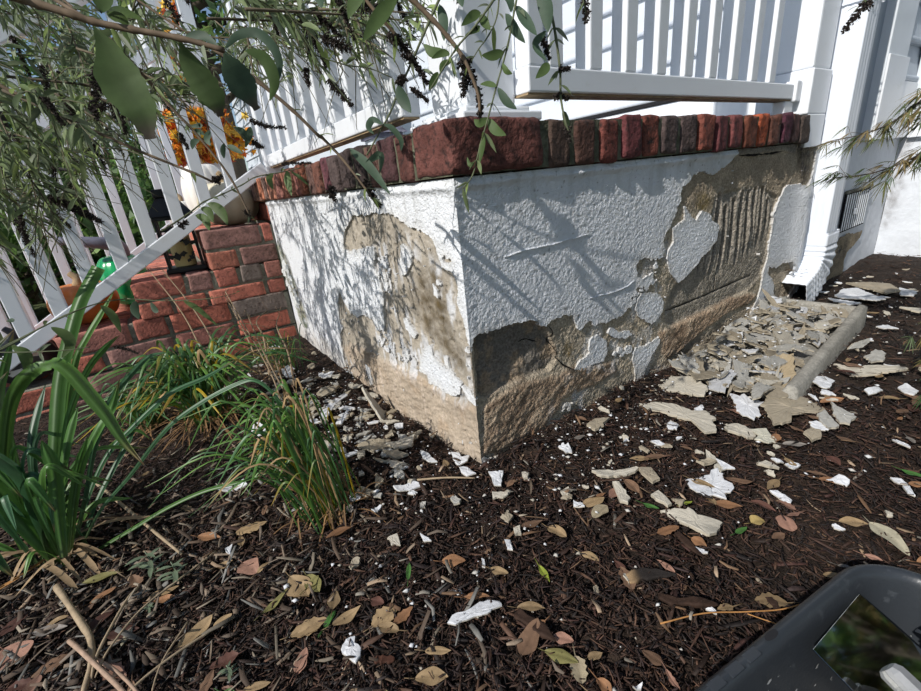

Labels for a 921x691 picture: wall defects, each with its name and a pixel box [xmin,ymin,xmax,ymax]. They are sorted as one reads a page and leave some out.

crack [518,327,576,371]
peeling [339,144,815,486]